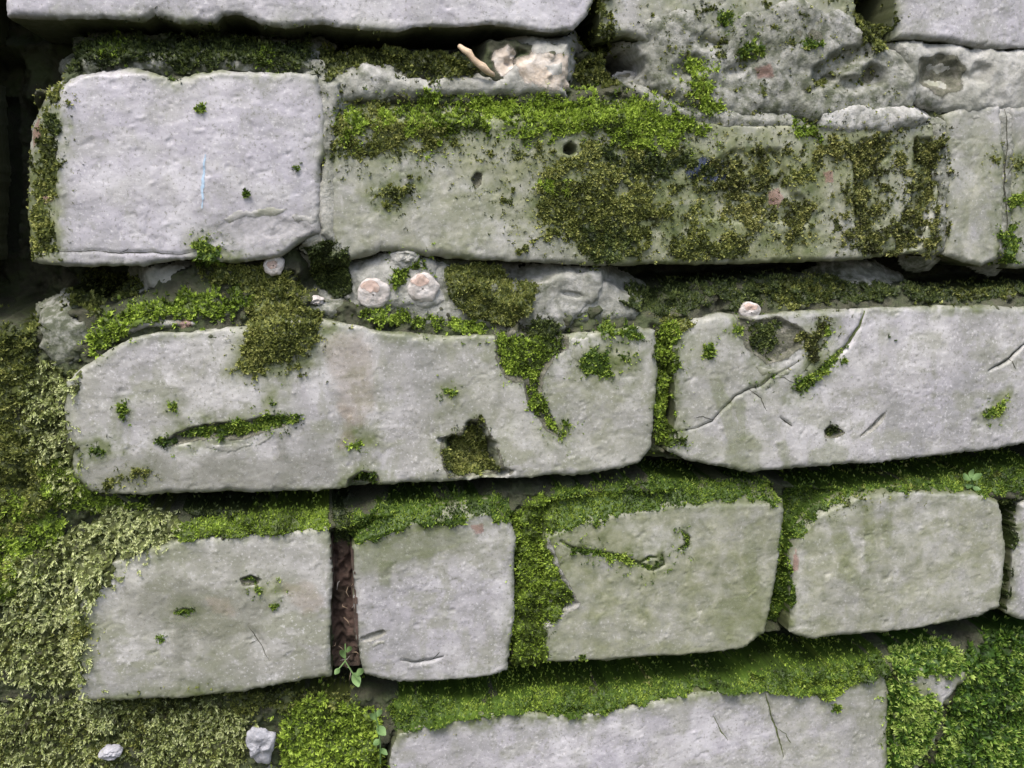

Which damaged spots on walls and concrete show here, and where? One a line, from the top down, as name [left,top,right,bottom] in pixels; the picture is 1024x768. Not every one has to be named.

crack [678,311,865,431]